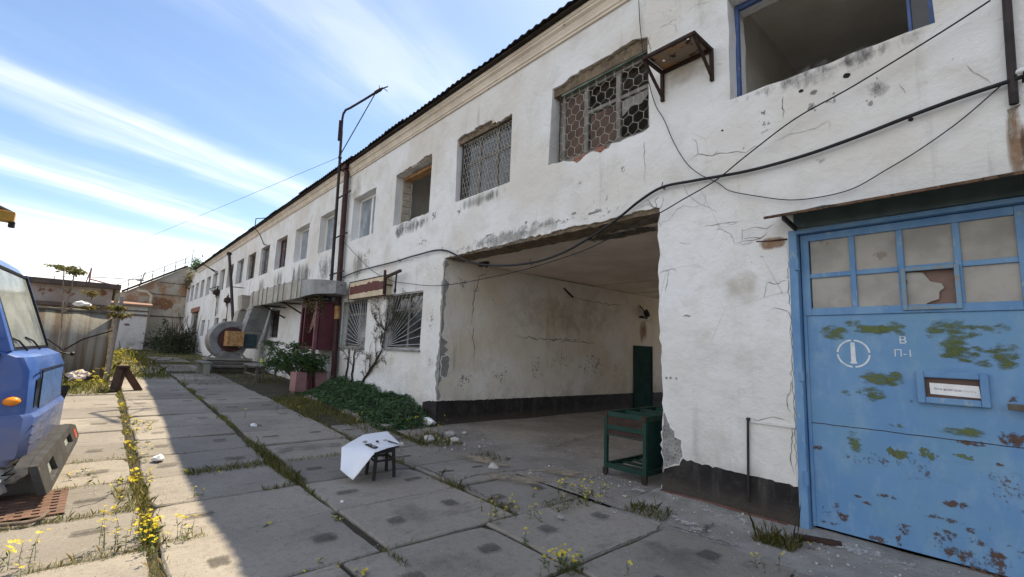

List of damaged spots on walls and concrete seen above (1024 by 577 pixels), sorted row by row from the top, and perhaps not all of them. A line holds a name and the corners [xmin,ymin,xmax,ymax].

corrosion [763,113,1024,219]
damp [468,221,551,249]
crack [600,189,774,244]
spalling [428,207,660,400]
spalling [660,411,684,472]
corrosion [998,434,1024,447]
corrosion [928,500,1007,577]